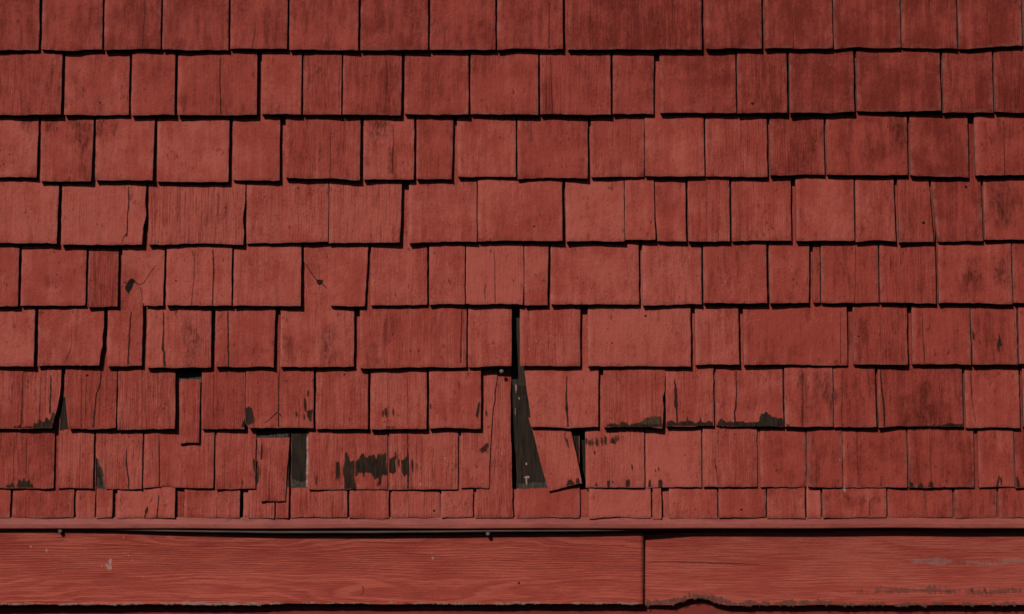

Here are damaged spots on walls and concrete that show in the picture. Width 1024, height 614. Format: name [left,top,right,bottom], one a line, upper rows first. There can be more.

crack [121,187,129,241]
crack [127,266,166,367]
peeling [14,396,68,430]
peeling [241,391,317,488]
peeling [336,452,418,491]
peeling [512,385,548,489]
peeling [565,411,789,487]
peeling [646,587,1023,607]